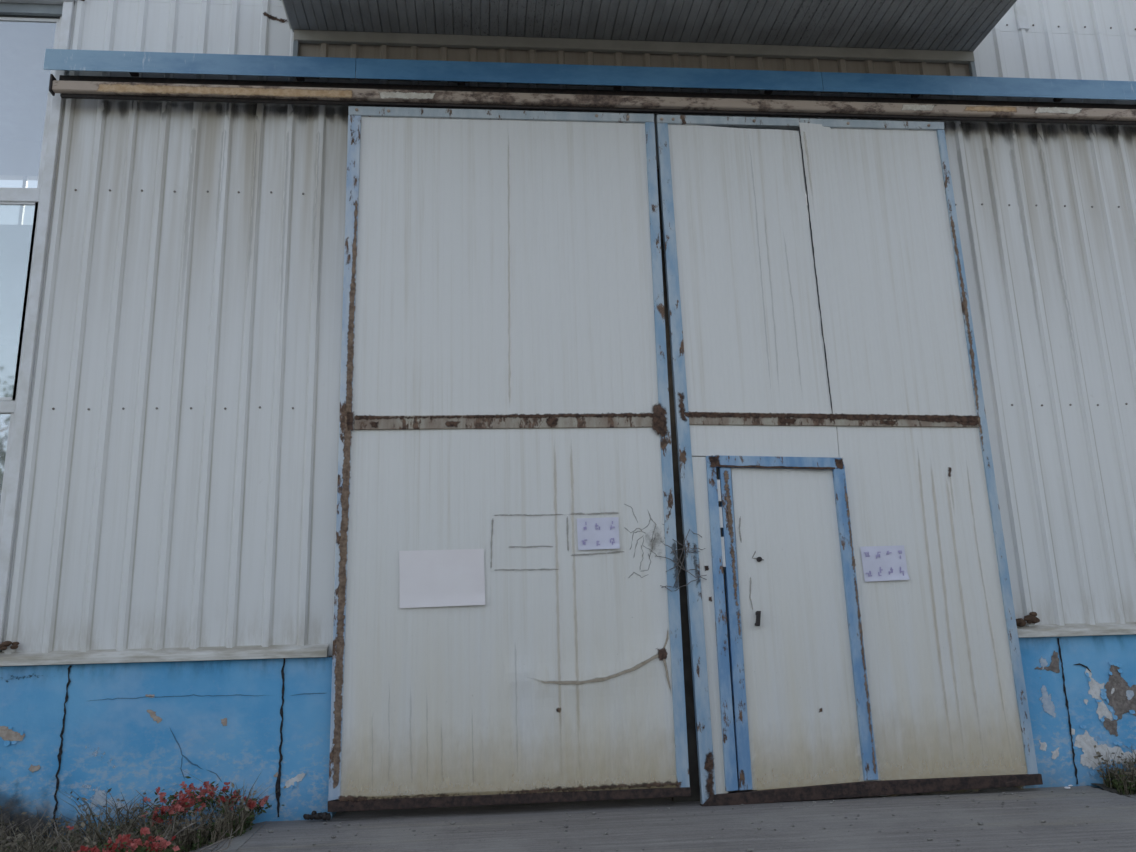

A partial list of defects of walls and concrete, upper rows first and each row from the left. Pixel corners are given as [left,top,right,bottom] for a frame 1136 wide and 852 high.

rust [97,84,353,98]
damp [217,103,348,117]
damp [952,122,1136,139]
rust [332,203,984,802]
peeling [0,726,25,746]
crack [52,658,325,840]
peeling [1035,651,1060,717]
crack [1057,638,1091,784]
flaking render [1069,661,1136,776]